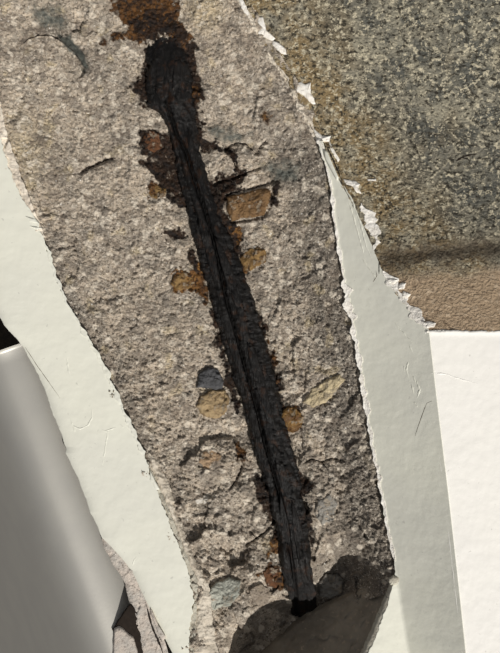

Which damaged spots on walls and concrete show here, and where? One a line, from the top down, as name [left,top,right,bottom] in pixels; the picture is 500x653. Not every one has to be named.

crack [20,34,86,68]
crack [82,158,116,172]
rust [99,0,248,257]
rust [270,181,281,207]
spalling [0,0,399,653]
rust [170,215,290,591]
rust [255,309,302,412]
rust [298,472,315,544]